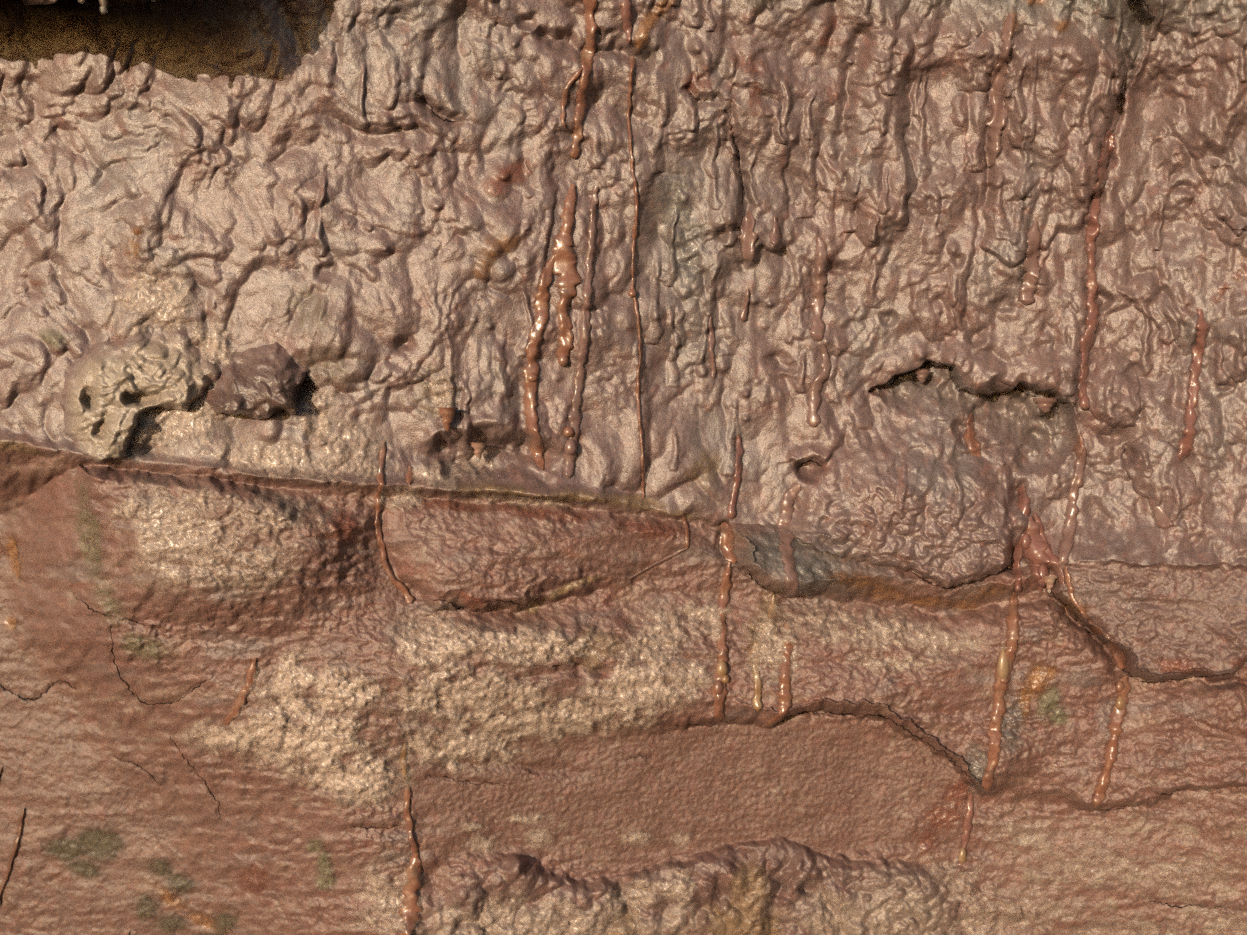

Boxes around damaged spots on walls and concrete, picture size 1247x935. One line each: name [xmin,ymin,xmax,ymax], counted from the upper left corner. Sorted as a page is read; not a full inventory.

rust [560,0,598,159]
rust [522,184,599,478]
rust [806,237,831,428]
rust [1078,130,1115,410]
rust [1177,263,1247,461]
rust [395,744,423,935]
efflorescence [183,600,729,808]
rust [711,435,744,722]
rust [749,483,801,729]
crack [780,711,974,783]
rust [919,435,1131,896]
crack [1051,592,1239,683]